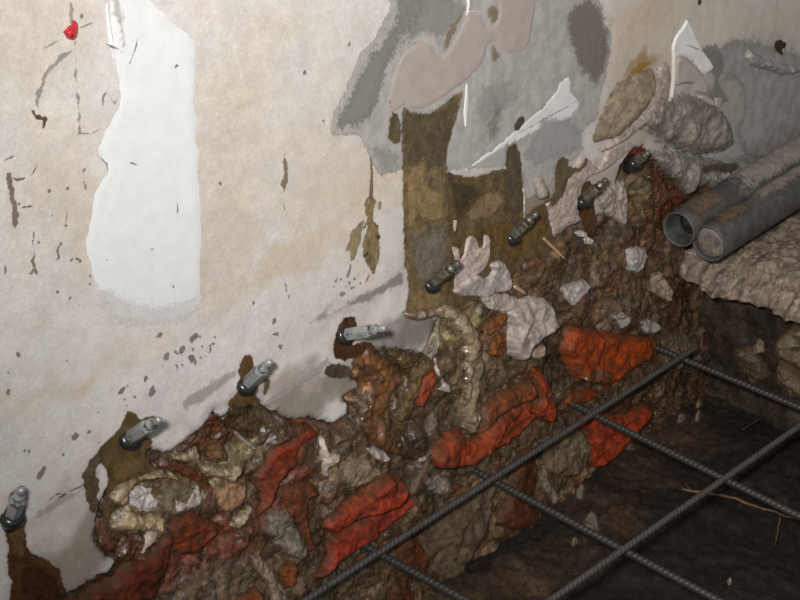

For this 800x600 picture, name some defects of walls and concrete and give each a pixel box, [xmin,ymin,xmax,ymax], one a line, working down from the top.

damp [567,0,608,82]
flaking render [774,40,786,55]
damp [346,156,380,274]
damp [388,92,588,313]
flaking render [543,62,711,235]
spalling [60,187,800,600]
rust [6,492,66,600]